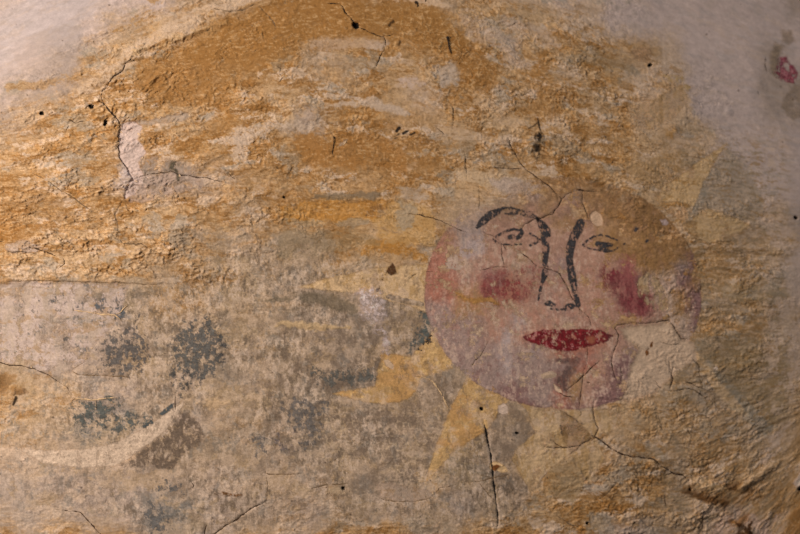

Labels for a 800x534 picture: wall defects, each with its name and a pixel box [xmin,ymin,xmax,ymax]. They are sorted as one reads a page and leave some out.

crack [329,3,391,66]
flaking render [118,113,201,202]
crack [100,60,235,183]
crack [495,138,593,228]
crack [410,213,591,323]
crack [549,315,720,479]
crack [204,472,348,534]
crack [474,421,508,520]